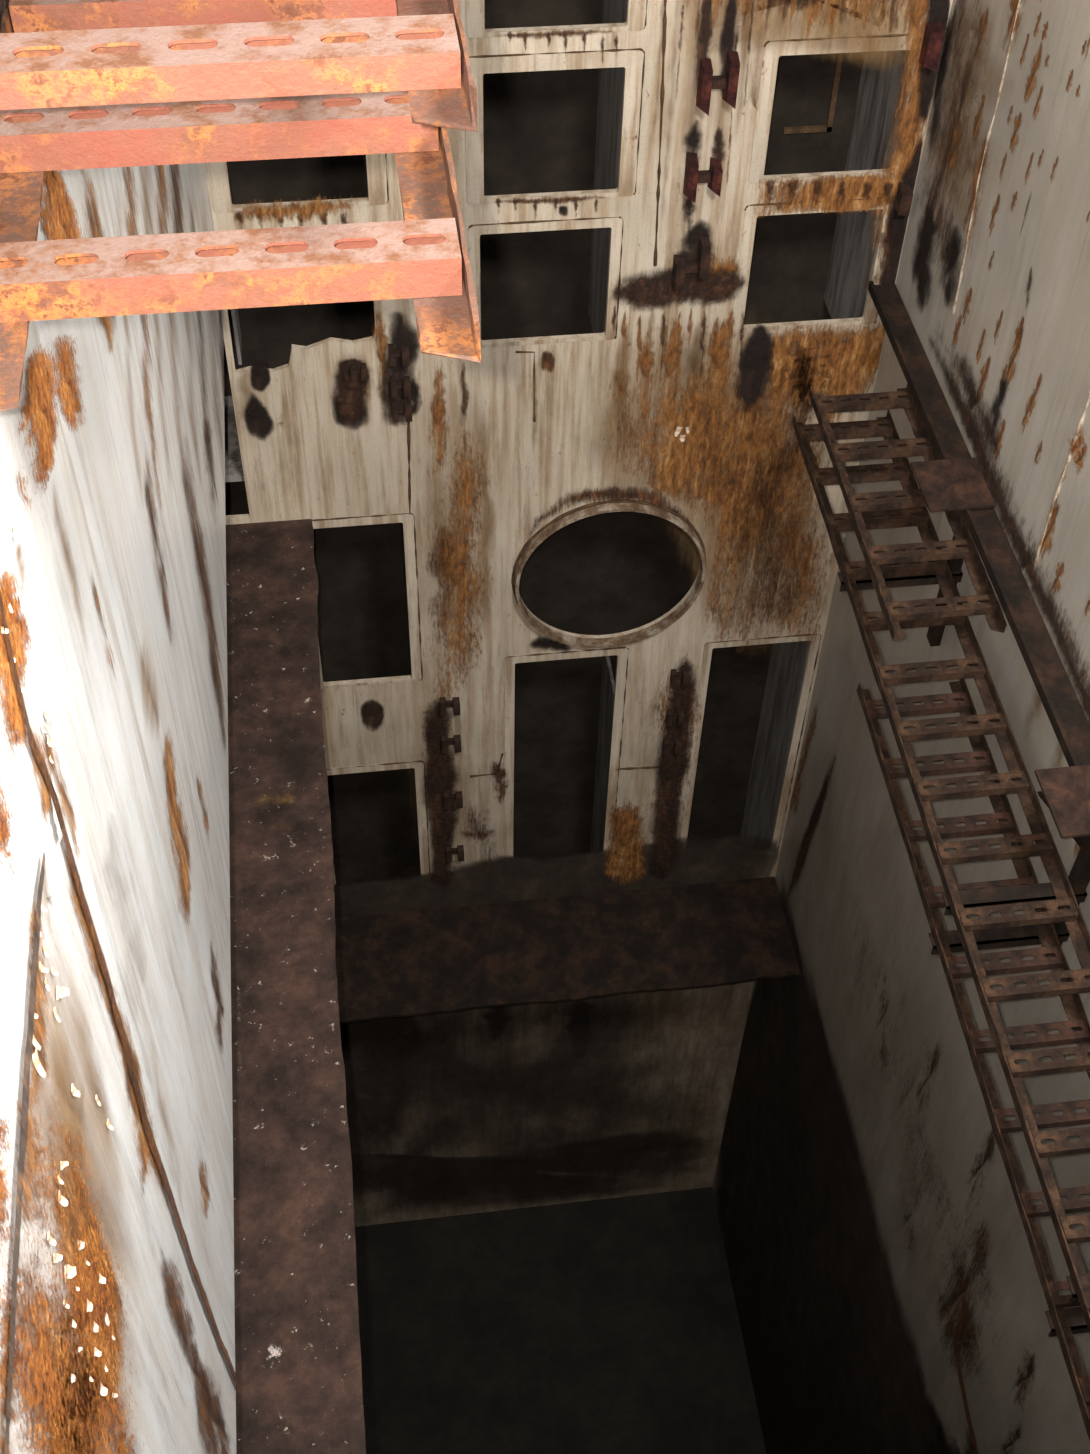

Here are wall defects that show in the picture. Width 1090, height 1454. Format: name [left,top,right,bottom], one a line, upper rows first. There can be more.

rust [17,334,86,513]
rust [40,170,105,240]
rust [123,164,195,236]
water stain [333,313,420,424]
water stain [612,198,773,412]
rust [531,319,885,644]
rust [696,0,988,284]
rust [930,288,1090,725]
water stain [334,661,778,918]
water stain [340,996,696,1208]
water stain [718,707,960,1454]
rust [0,1071,136,1454]